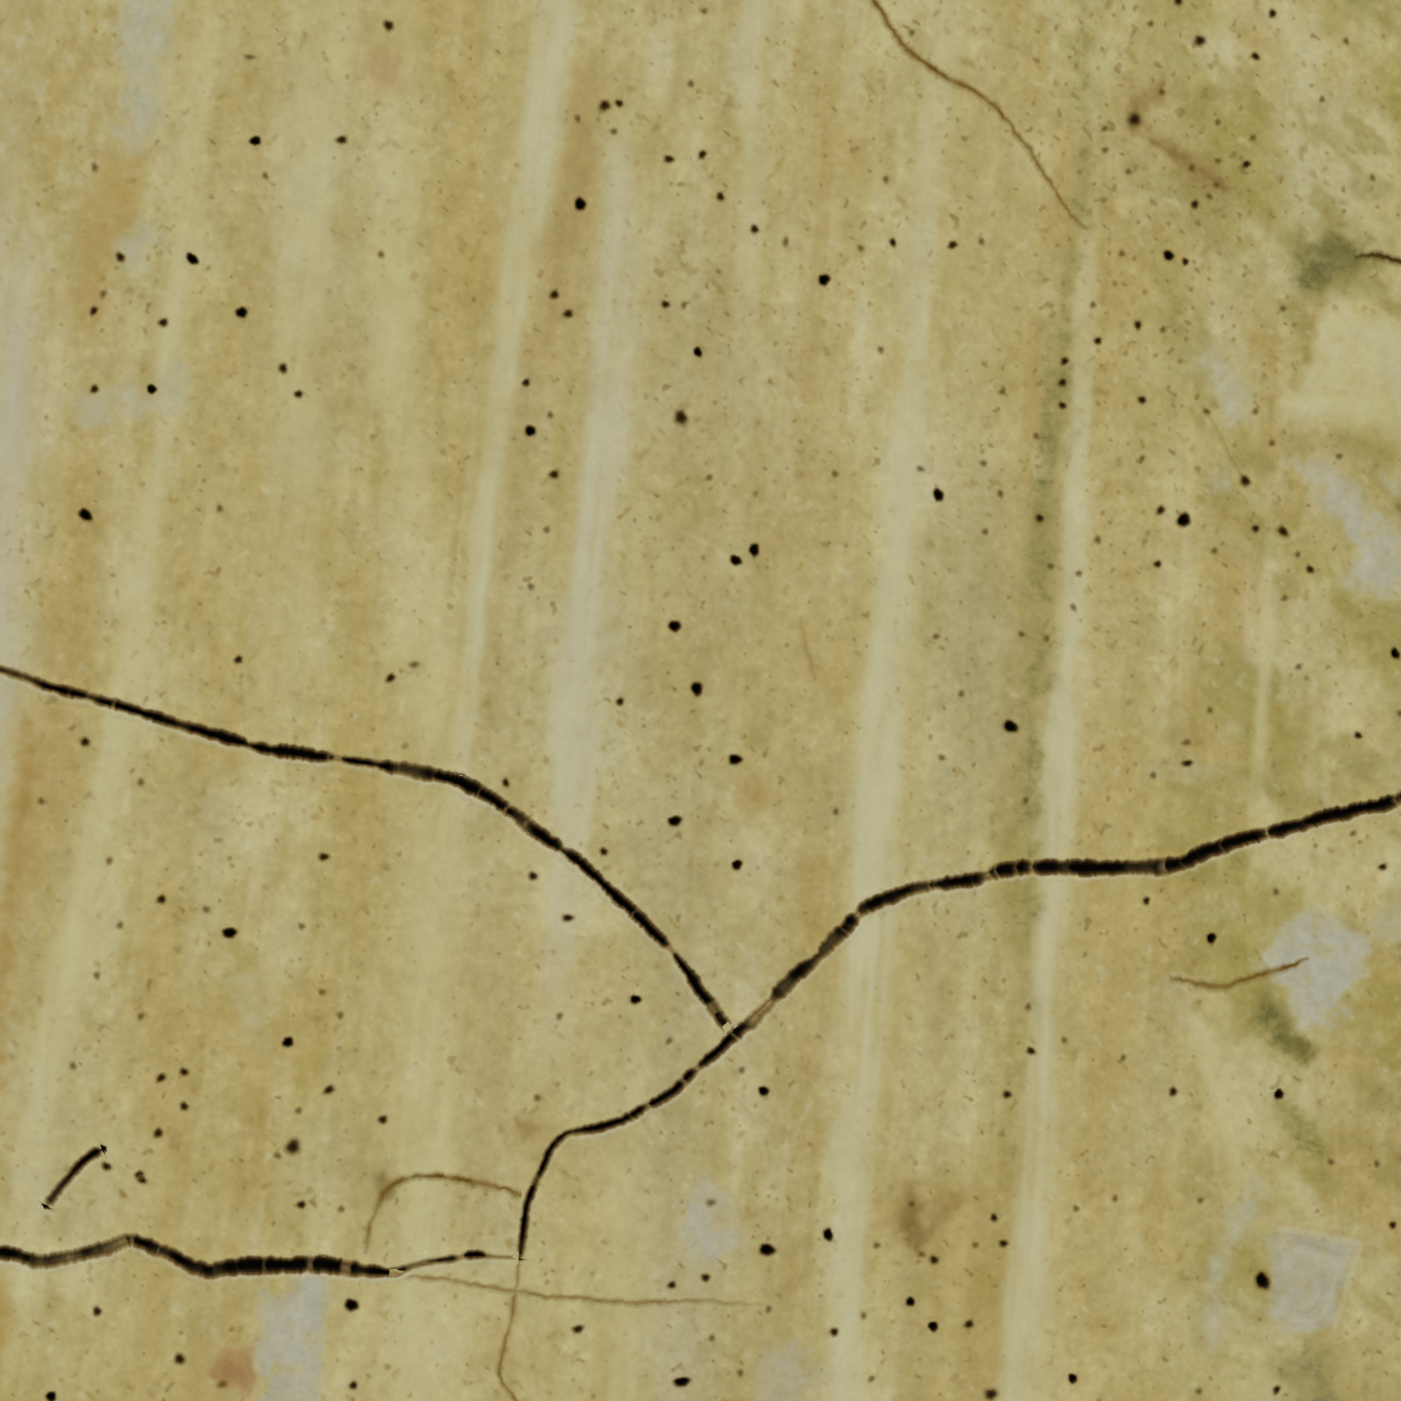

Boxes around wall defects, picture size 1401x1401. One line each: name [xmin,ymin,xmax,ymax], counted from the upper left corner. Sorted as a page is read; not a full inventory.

crack [867,0,1090,231]
crack [1354,249,1401,268]
crack [0,659,1401,1401]